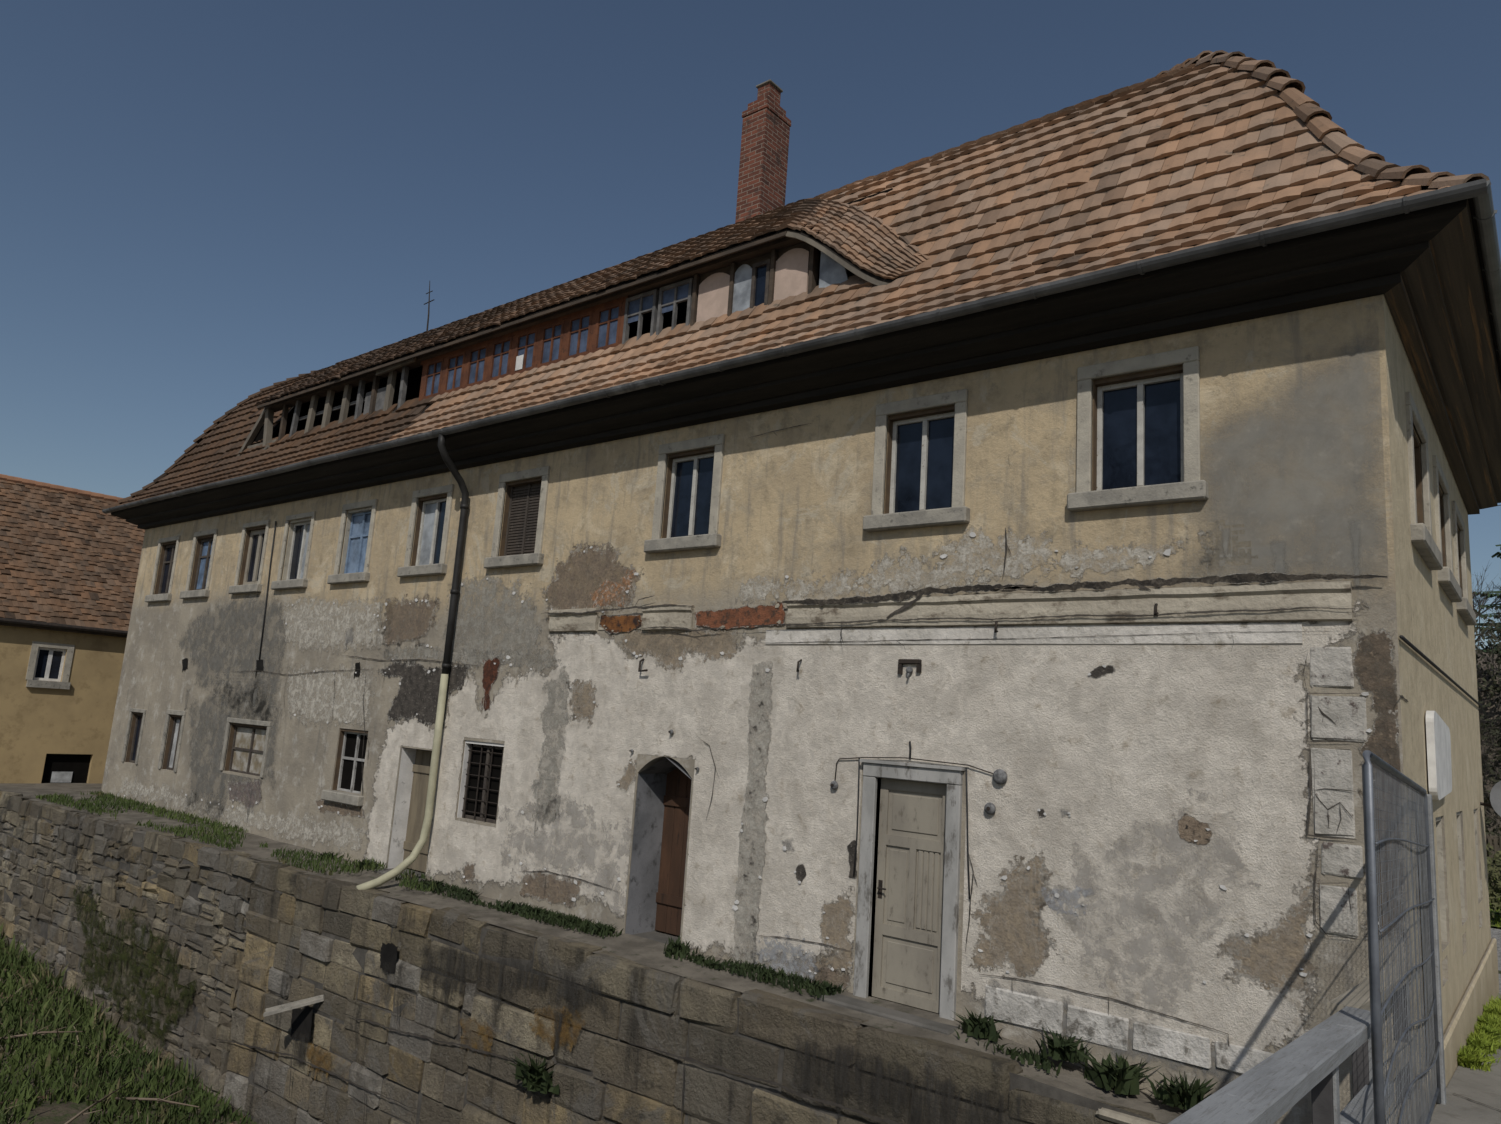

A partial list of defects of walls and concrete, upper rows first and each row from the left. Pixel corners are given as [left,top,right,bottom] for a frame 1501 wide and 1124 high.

peeling [735,527,1216,624]
corrosion [482,658,500,711]
peeling [286,542,749,914]
peeling [805,840,857,984]
peeling [969,788,1319,1016]